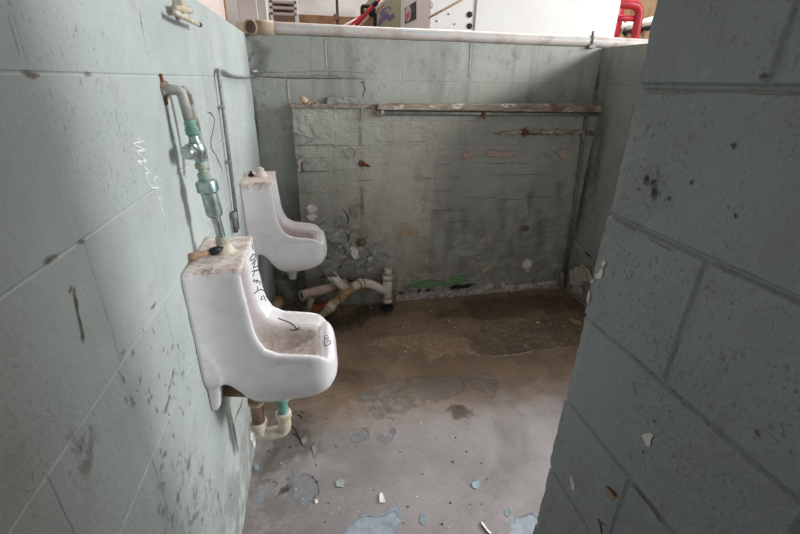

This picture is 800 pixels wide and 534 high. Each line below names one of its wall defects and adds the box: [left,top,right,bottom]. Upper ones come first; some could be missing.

peeling [318,203,389,283]
peeling [398,273,475,295]
spalling [587,260,607,303]
peeling [343,507,402,534]